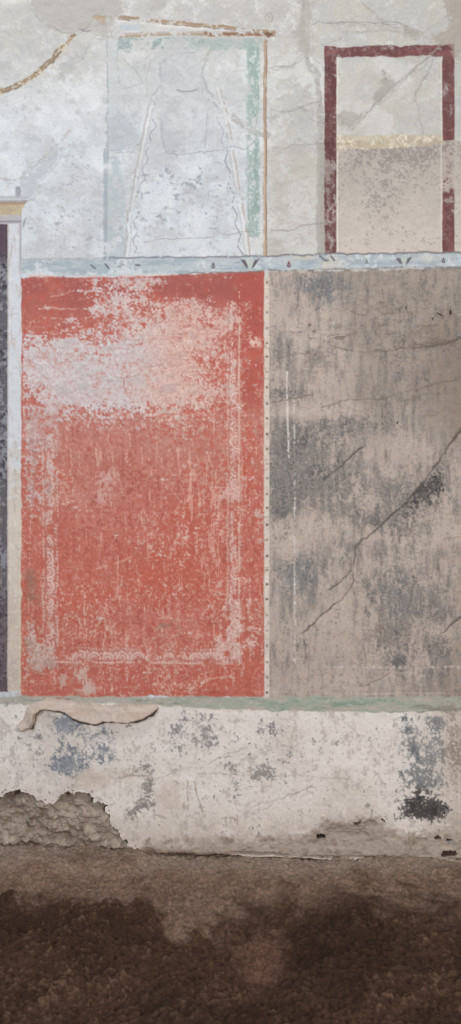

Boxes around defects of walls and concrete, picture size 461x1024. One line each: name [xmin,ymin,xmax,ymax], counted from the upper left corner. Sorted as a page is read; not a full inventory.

peeling [20,275,264,520]
crack [300,426,461,634]
peeling [205,590,263,664]
spalling [0,786,461,861]
damp [392,700,461,830]